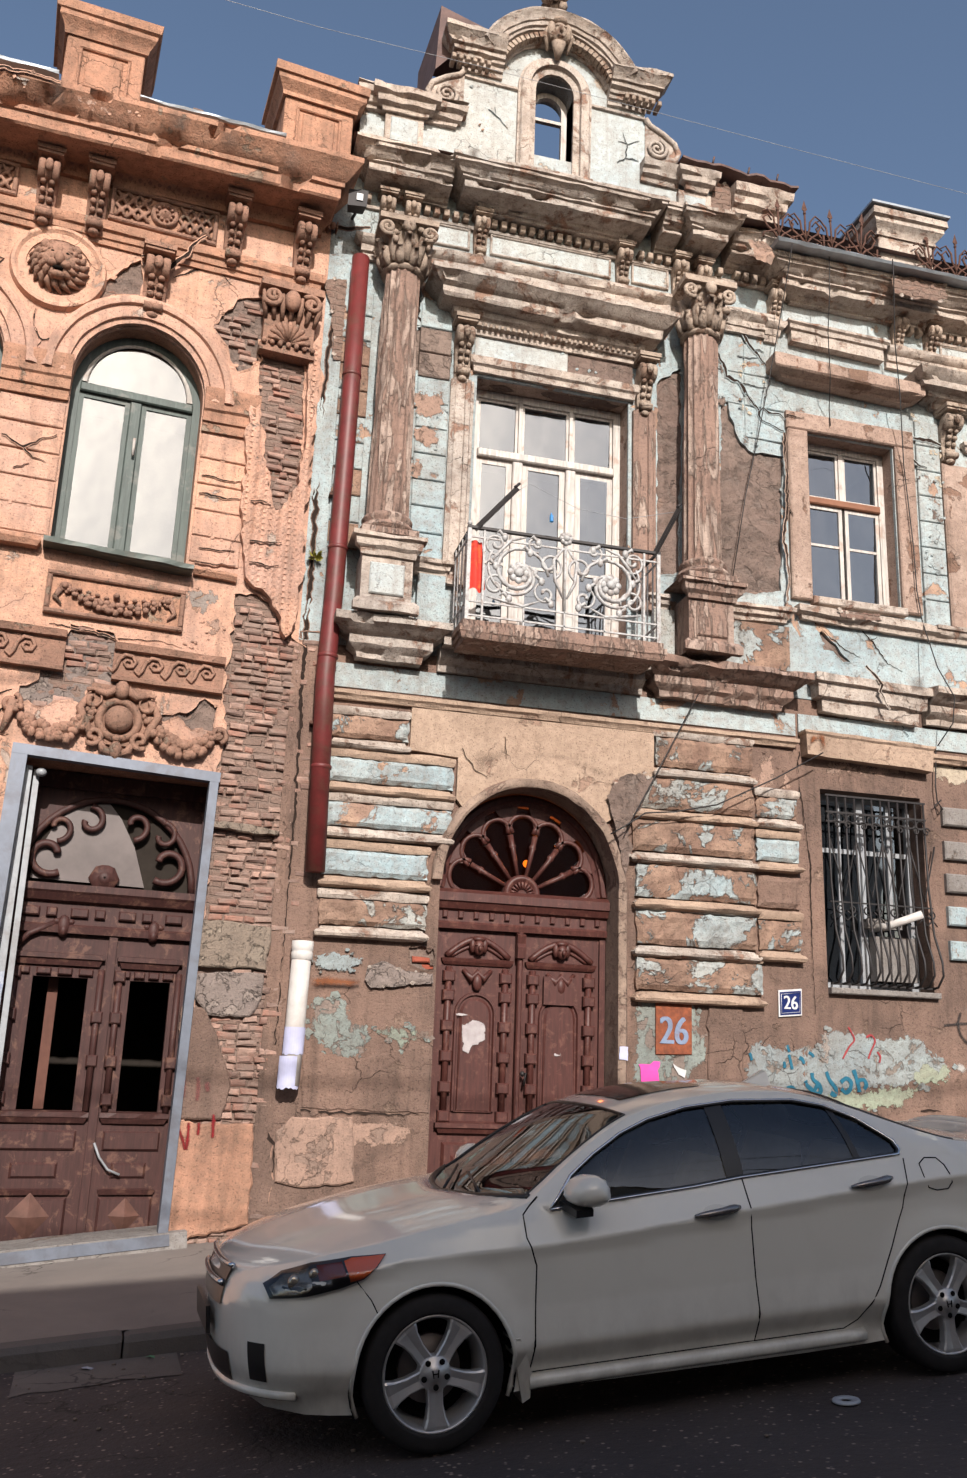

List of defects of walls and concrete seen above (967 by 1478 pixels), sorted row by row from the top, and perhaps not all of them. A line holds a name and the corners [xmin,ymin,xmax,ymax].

crack [617,133,639,162]
crack [1,433,58,468]
flaking render [211,296,307,510]
peeling [411,391,449,479]
flaking render [718,394,785,597]
crack [718,334,909,736]
flaking render [160,586,371,1151]
flaking render [396,944,436,985]
peeling [305,991,435,1058]
peeling [744,1025,959,1112]
peeling [353,1116,420,1148]
flaking render [187,1162,274,1244]